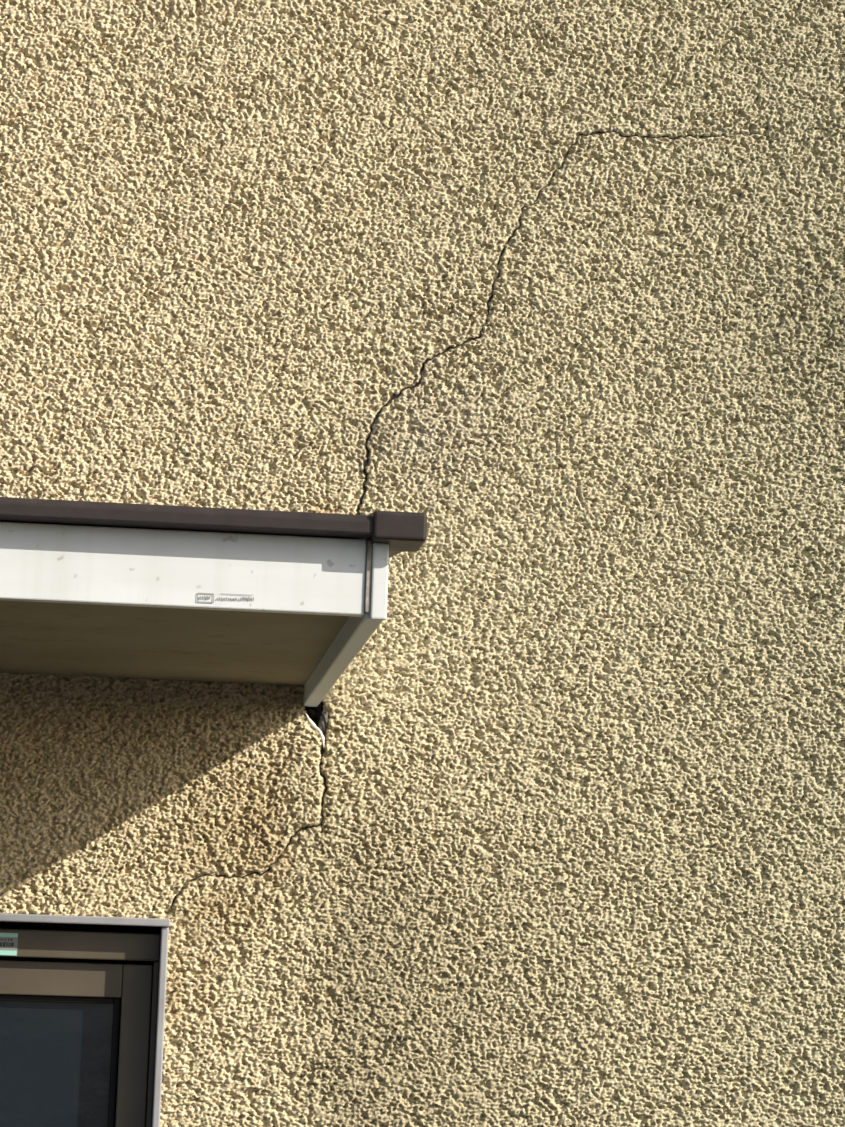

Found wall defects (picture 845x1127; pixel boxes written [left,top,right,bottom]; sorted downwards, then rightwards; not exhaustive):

crack [356,130,775,515]
crack [167,743,327,913]